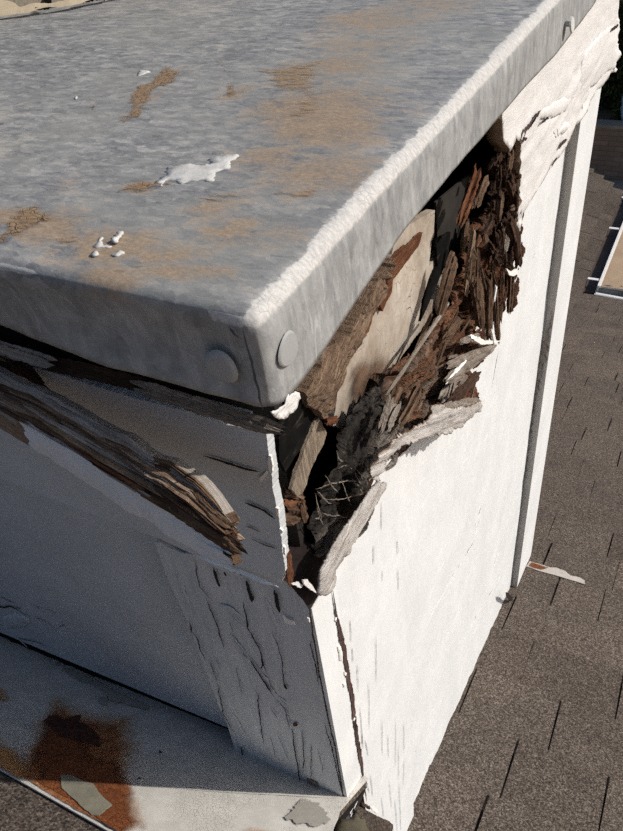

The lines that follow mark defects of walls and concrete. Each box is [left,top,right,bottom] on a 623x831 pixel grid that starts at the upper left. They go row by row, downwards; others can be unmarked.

peeling [259,454,274,482]
peeling [291,401,483,596]
rust [0,705,135,831]
crack [0,567,343,794]
crack [333,592,371,810]